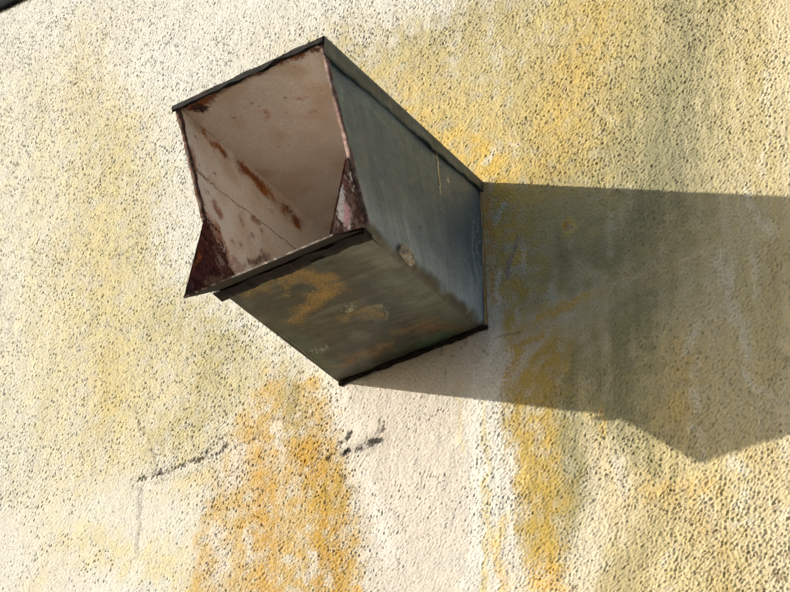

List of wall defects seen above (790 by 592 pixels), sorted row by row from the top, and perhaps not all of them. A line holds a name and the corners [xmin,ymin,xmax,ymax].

leakage [447,0,790,592]